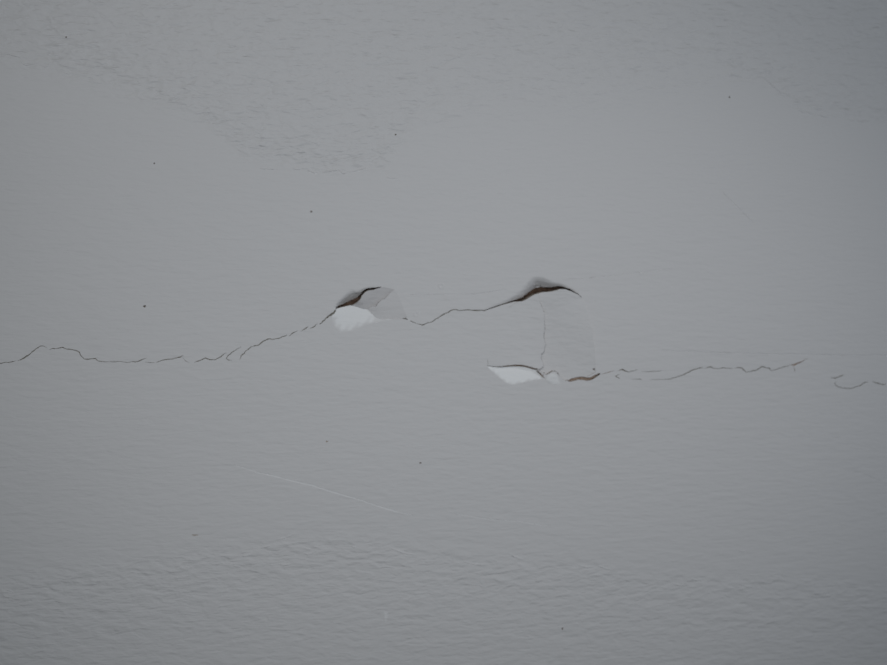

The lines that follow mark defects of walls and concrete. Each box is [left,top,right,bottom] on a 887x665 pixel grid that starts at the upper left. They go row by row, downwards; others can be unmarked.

crack [0,310,336,364]
spalling [332,287,407,332]
crack [404,309,485,326]
crack [510,286,570,340]
spalling [488,365,545,385]
crack [603,359,806,381]